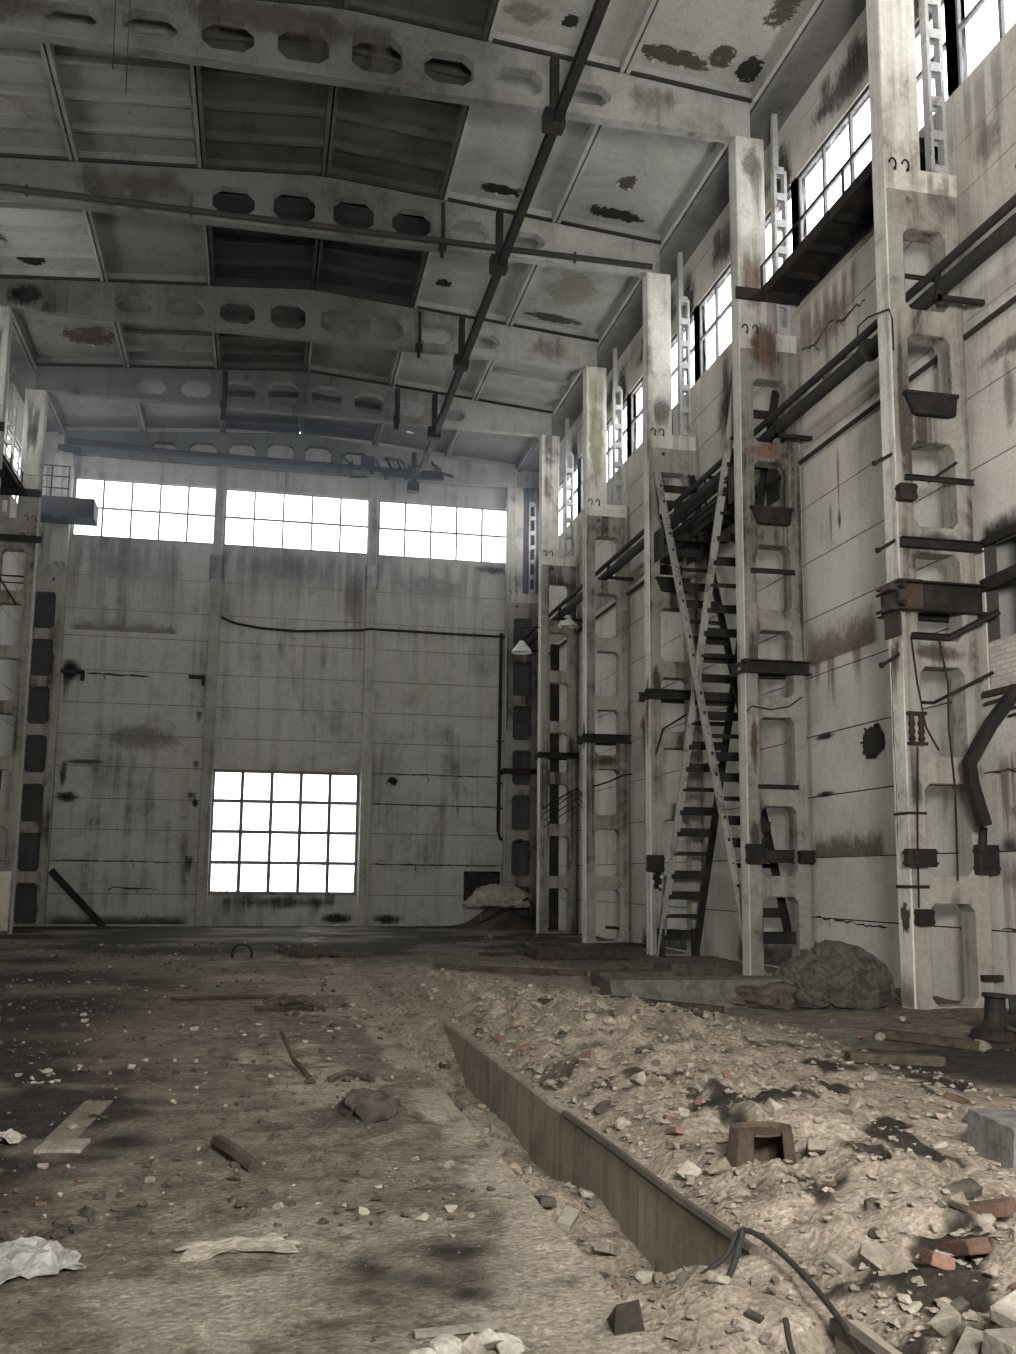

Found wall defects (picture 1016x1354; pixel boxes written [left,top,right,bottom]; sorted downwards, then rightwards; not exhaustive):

peeling [763,0,803,33]
peeling [640,43,765,84]
peeling [480,183,523,199]
peeling [615,174,638,192]
peeling [587,204,646,223]
peeling [63,326,115,347]
leakage [984,516,1016,539]
leakage [1004,838,1016,852]